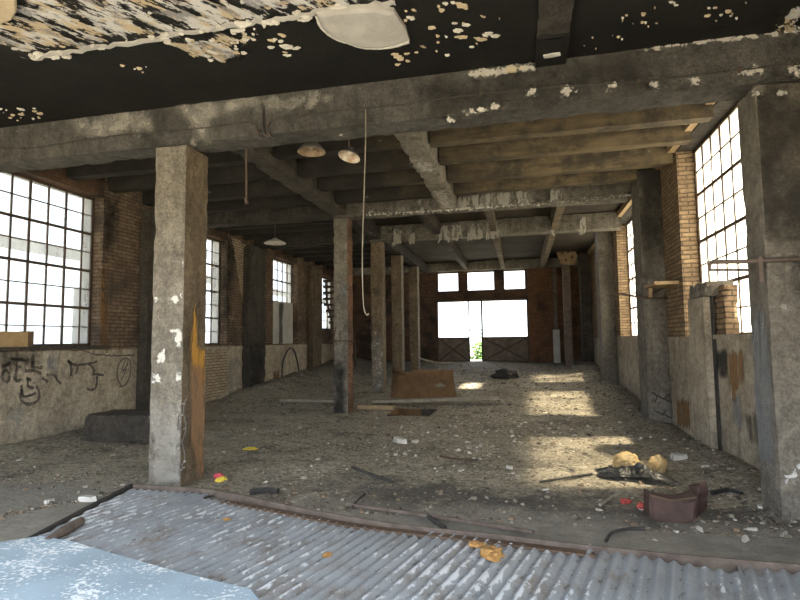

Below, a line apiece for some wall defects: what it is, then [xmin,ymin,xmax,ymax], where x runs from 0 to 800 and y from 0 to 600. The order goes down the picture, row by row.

peeling [0,0,500,66]
spalling [468,63,536,78]
spalling [738,64,764,76]
peeling [366,189,631,216]
peeling [392,228,415,247]
peeling [438,220,500,244]
corrosion [191,308,205,474]
crack [652,392,672,419]